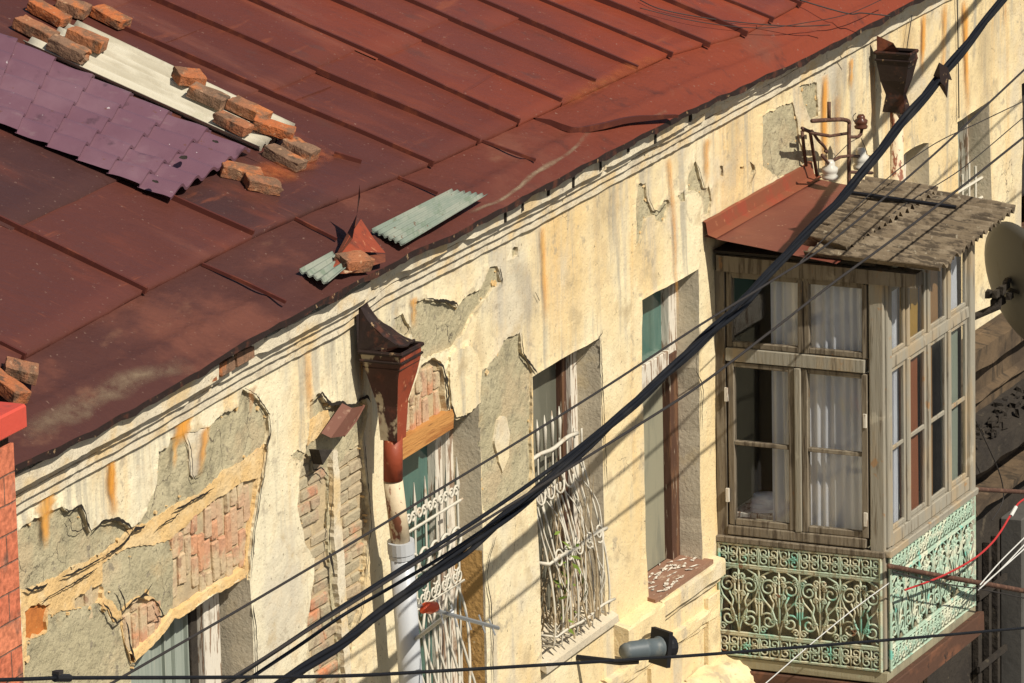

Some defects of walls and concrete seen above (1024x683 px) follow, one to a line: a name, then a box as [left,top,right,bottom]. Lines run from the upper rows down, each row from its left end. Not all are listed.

rust [40,495,54,539]
flaking render [17,391,266,598]
rust [174,418,191,458]
spalling [291,394,368,683]
flaking render [394,266,498,431]
flaking render [478,334,530,512]
flaking render [122,599,161,651]